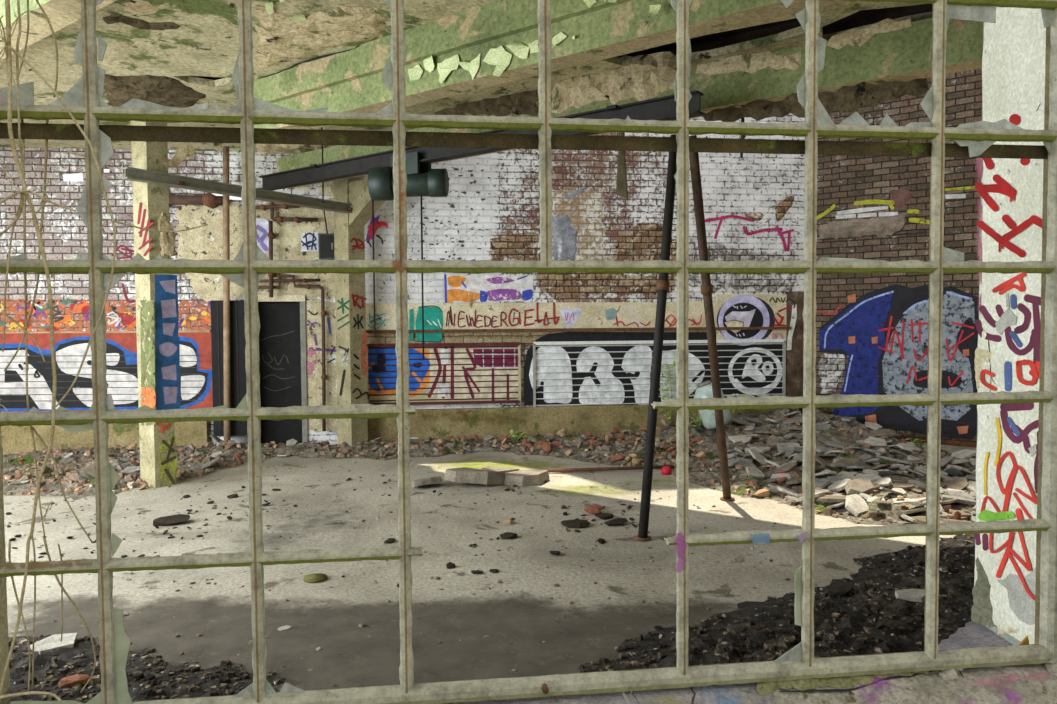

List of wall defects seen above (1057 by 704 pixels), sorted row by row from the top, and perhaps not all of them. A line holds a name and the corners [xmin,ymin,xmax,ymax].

peeling [408,40,539,84]
spalling [431,52,677,117]
peeling [552,32,575,47]
spalling [408,168,798,298]